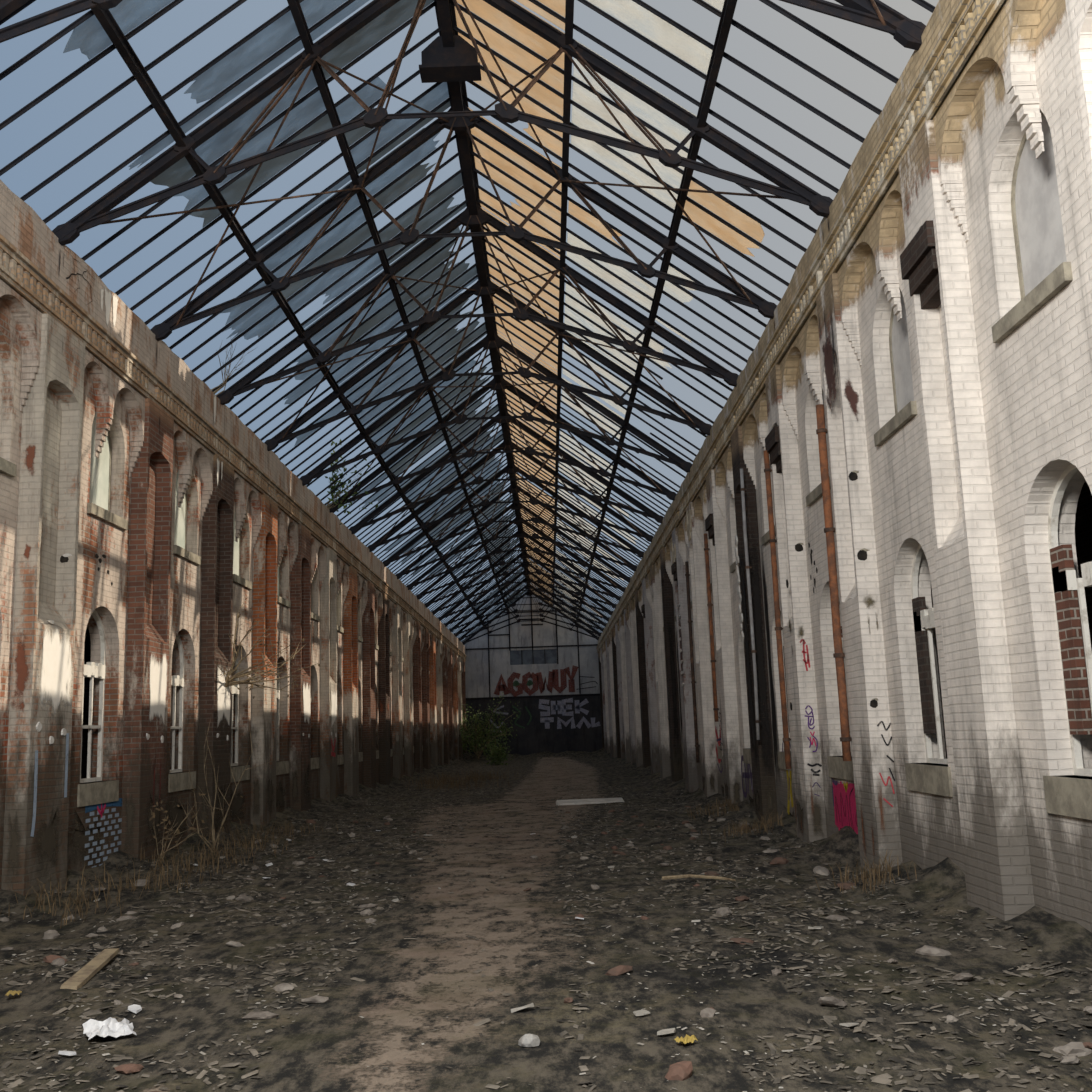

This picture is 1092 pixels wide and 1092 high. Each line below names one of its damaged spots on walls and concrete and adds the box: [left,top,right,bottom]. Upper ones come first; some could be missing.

peeling [149,654,167,722]
peeling [217,667,231,741]
peeling [303,684,311,738]